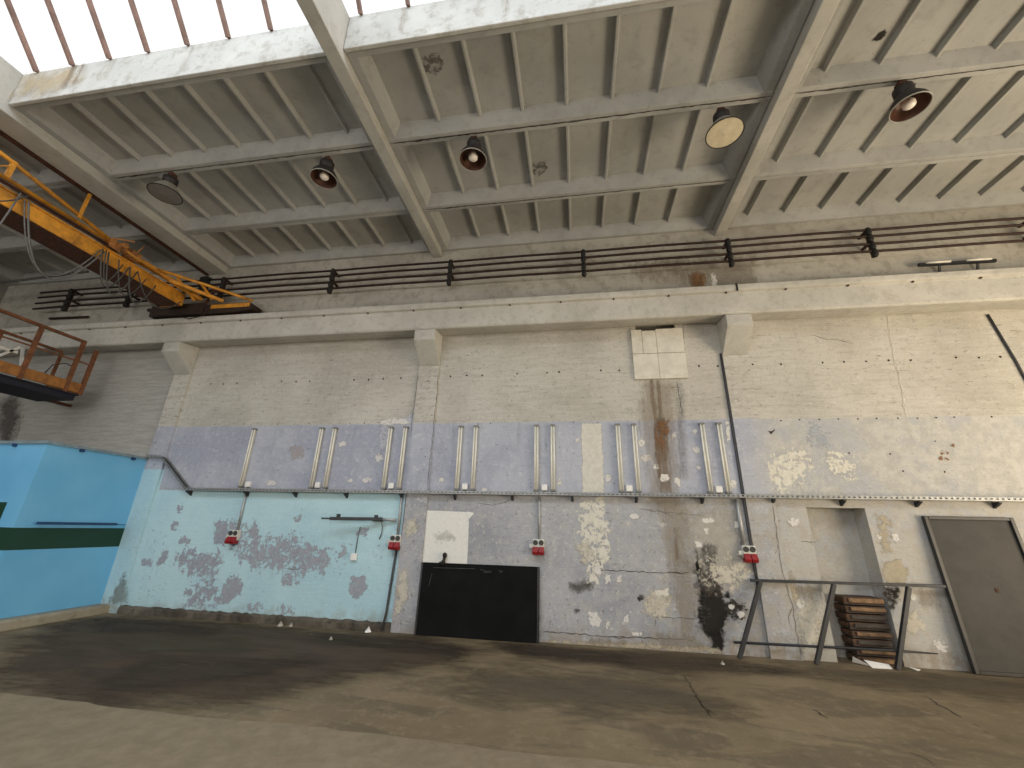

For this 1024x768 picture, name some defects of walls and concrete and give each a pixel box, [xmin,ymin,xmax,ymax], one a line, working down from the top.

mould [421,53,443,74]
peeling [767,419,859,500]
peeling [141,505,346,613]
peeling [349,575,368,600]
peeling [574,496,622,585]
crack [772,506,812,654]